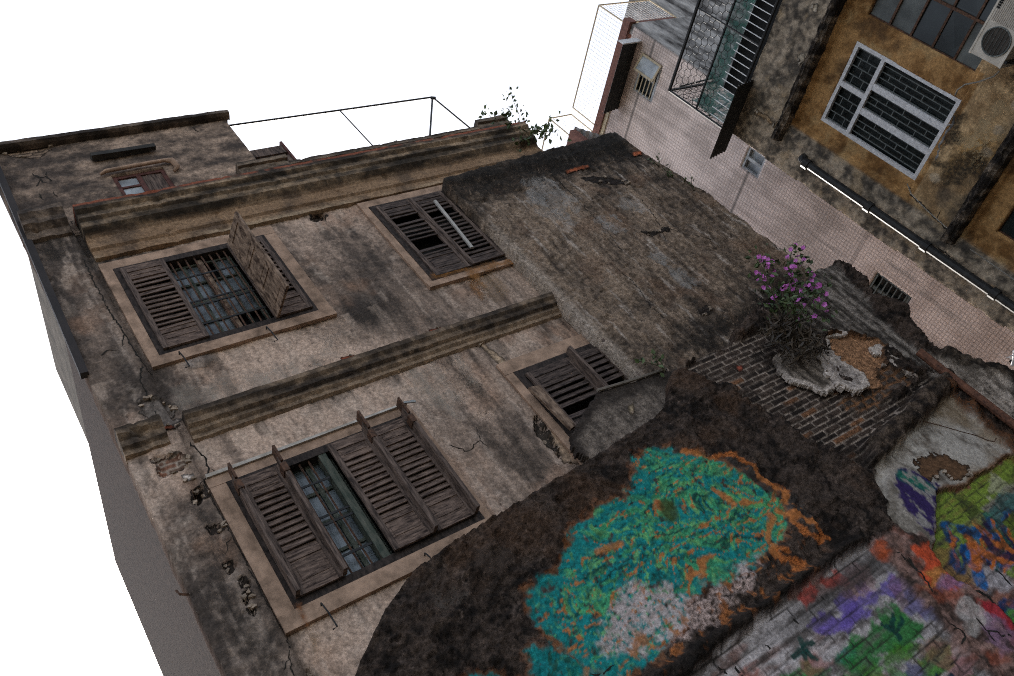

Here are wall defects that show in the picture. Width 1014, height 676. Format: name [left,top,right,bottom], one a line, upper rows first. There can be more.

damp [944,115,963,145]
crack [32,172,57,200]
damp [932,152,986,185]
crack [83,259,157,415]
spalling [136,394,182,431]
flaking render [682,327,941,470]
spalling [533,414,579,465]
spalling [149,450,211,506]
spalling [912,452,973,482]
spalling [204,520,228,535]
spalling [222,559,257,616]